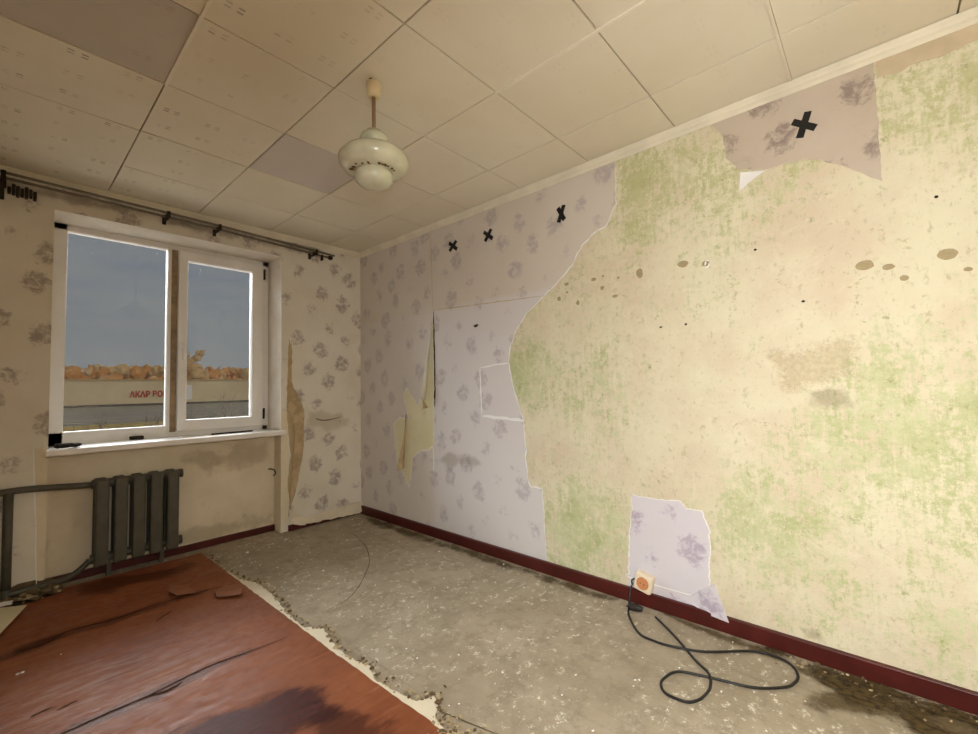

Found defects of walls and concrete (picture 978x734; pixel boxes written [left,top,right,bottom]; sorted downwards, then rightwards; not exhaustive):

peeling [281,340,305,525]
flaking render [394,319,434,486]
peeling [509,40,978,692]
water stain [171,687,341,734]